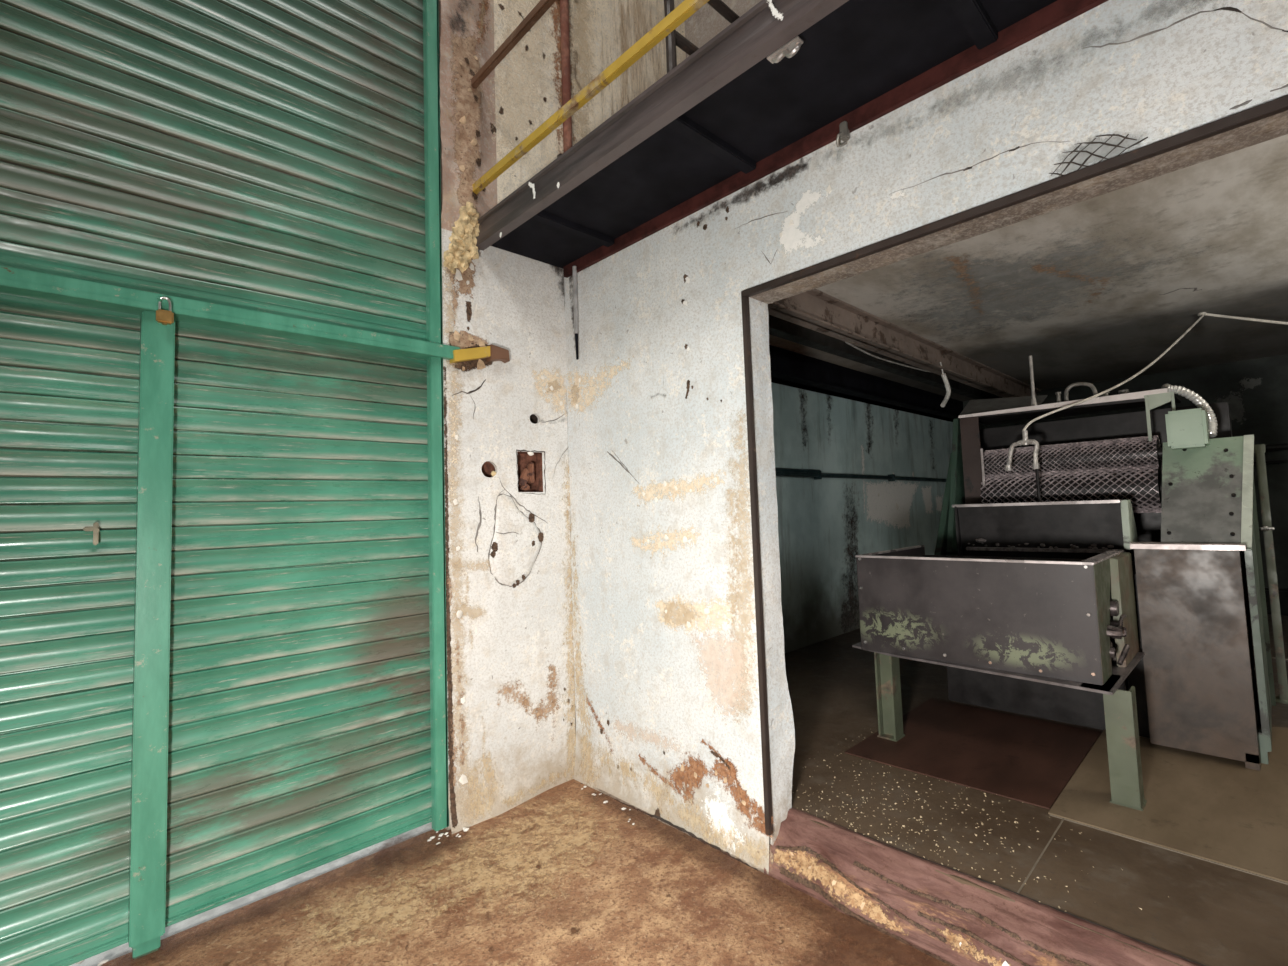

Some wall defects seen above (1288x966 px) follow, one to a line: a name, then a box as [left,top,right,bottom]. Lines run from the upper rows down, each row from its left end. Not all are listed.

crack [1081,7,1288,49]
crack [1229,84,1288,110]
crack [893,141,1070,193]
peeling [776,185,832,254]
damp [551,265,575,336]
peeling [443,0,557,828]
damp [692,417,754,715]
damp [468,465,942,966]
spalling [638,739,1089,966]